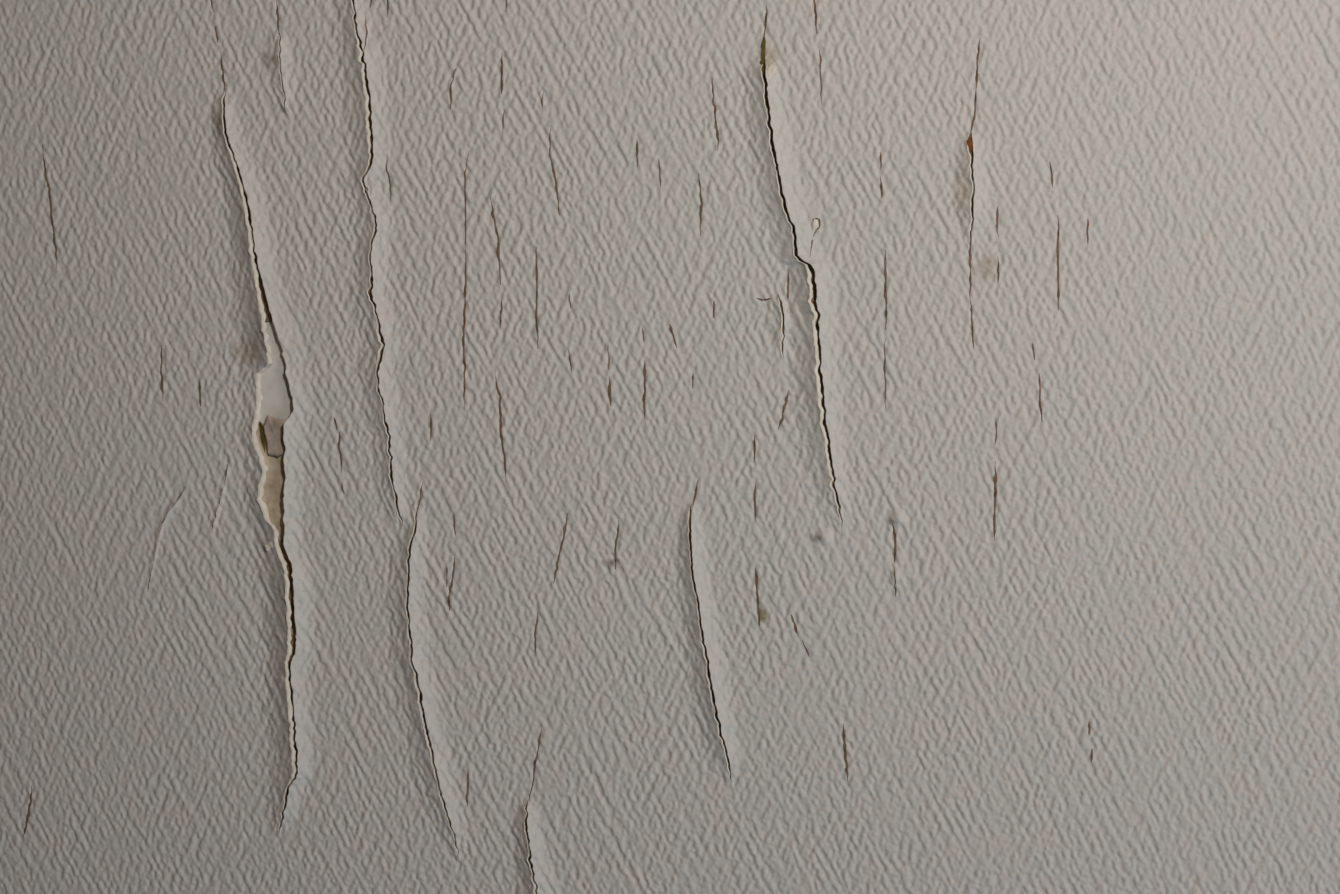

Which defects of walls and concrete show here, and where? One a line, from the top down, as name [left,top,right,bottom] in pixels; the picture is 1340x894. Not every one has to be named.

crack [385,154,393,200]
flaking render [258,322,293,458]
crack [427,414,435,442]
crack [754,218,821,522]
crack [446,516,456,611]
crack [755,569,810,657]